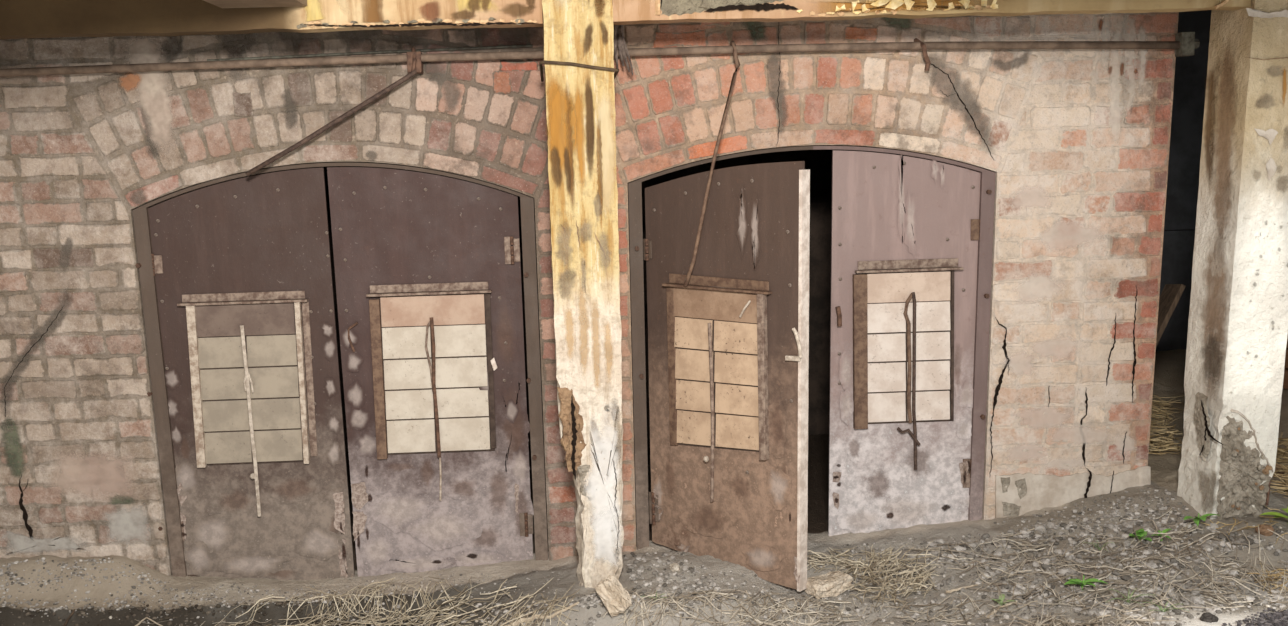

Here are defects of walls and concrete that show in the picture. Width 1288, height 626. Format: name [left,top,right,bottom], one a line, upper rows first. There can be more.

leakage [453,0,535,42]
peeling [655,0,998,17]
crack [930,63,993,158]
crack [995,54,1027,70]
leakage [1204,57,1233,389]
crack [4,307,63,417]
crack [990,317,1011,473]
crack [1080,287,1138,498]
crack [19,474,34,539]
peeling [557,387,632,619]
spalling [1194,392,1274,520]